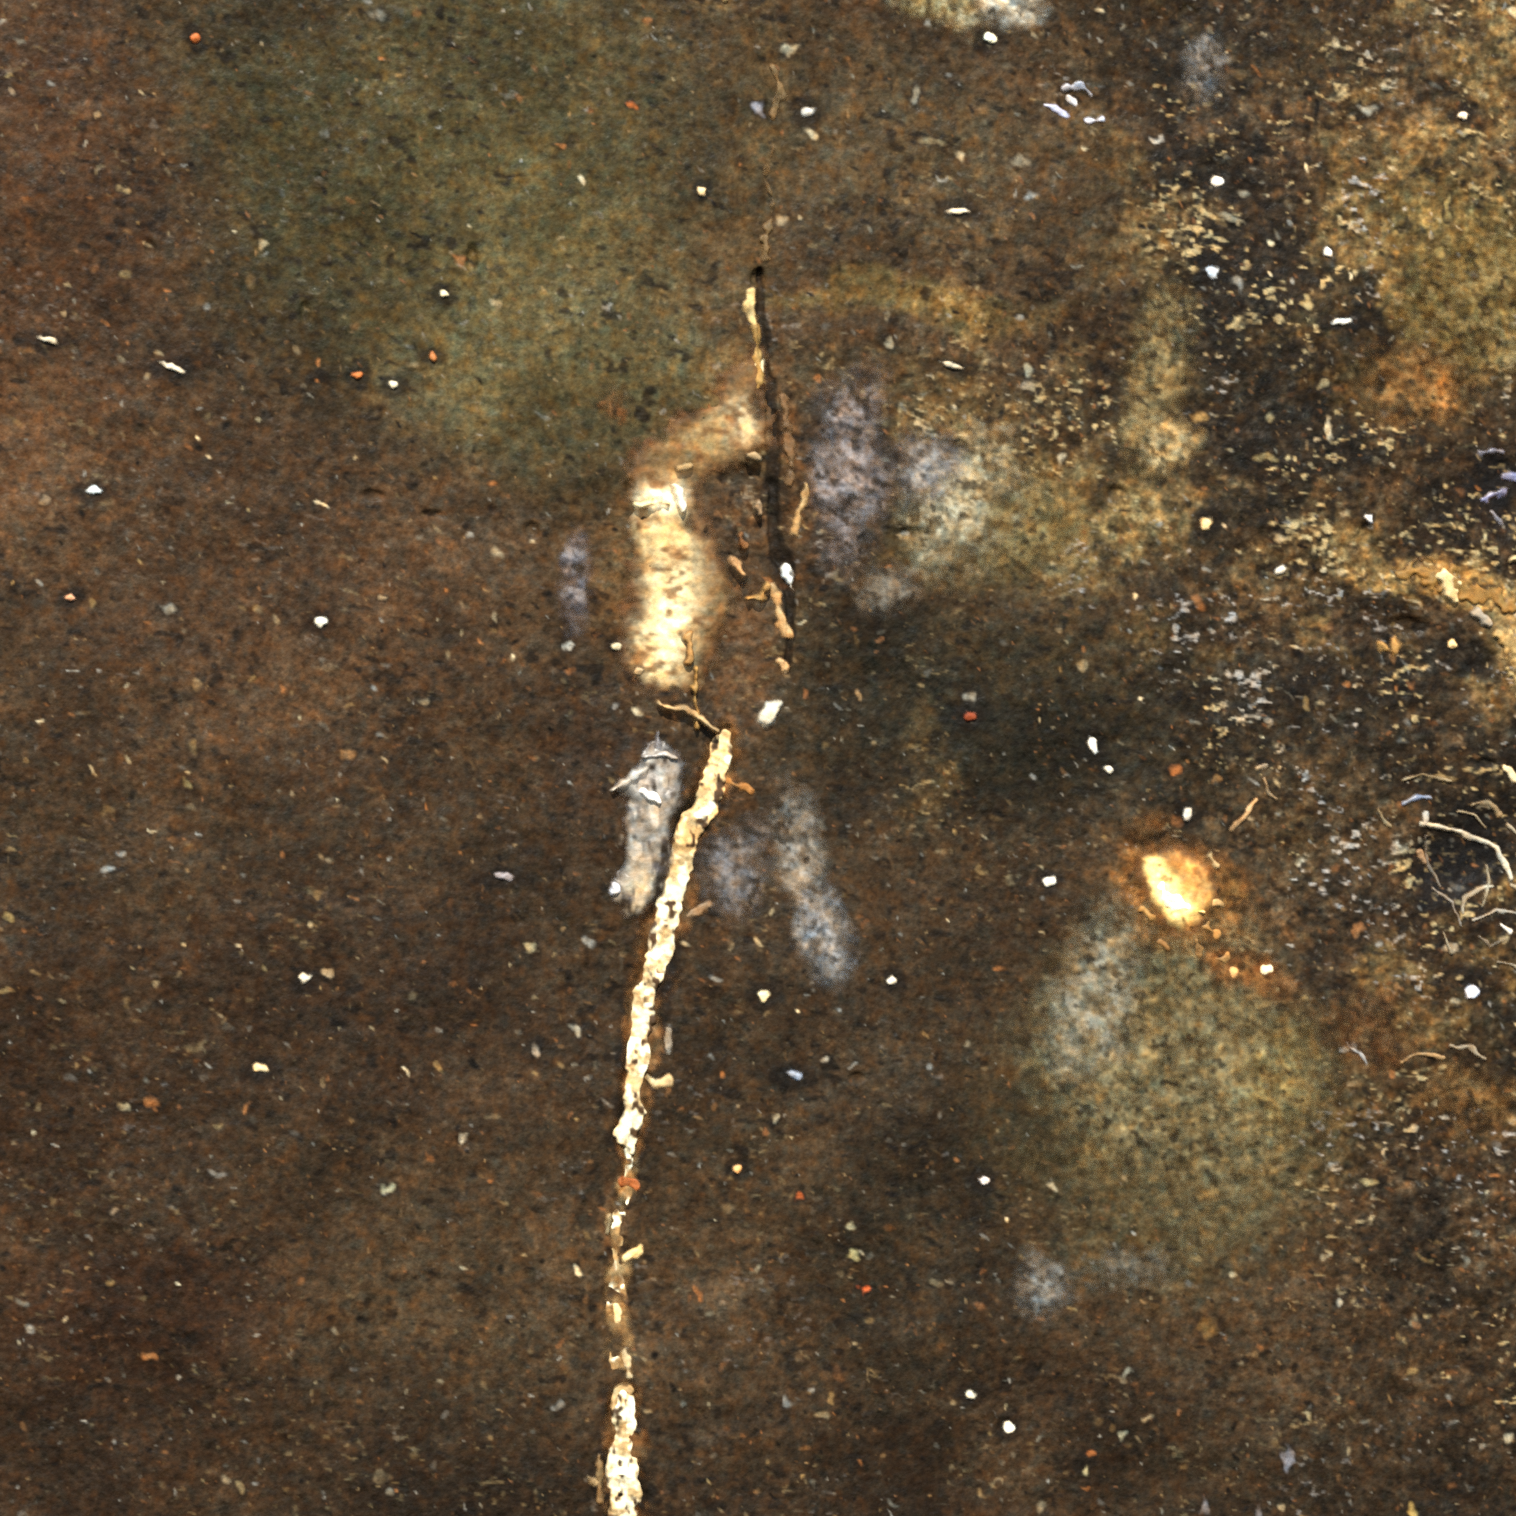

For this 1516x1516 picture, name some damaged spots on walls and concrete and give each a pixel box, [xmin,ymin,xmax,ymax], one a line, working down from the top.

crack [590,64,809,1516]
corrosion [1203,872,1244,925]
corrosion [1209,951,1272,984]
damp [1045,930,1295,1212]
damp [1027,1267,1063,1311]
damp [1109,1250,1163,1279]